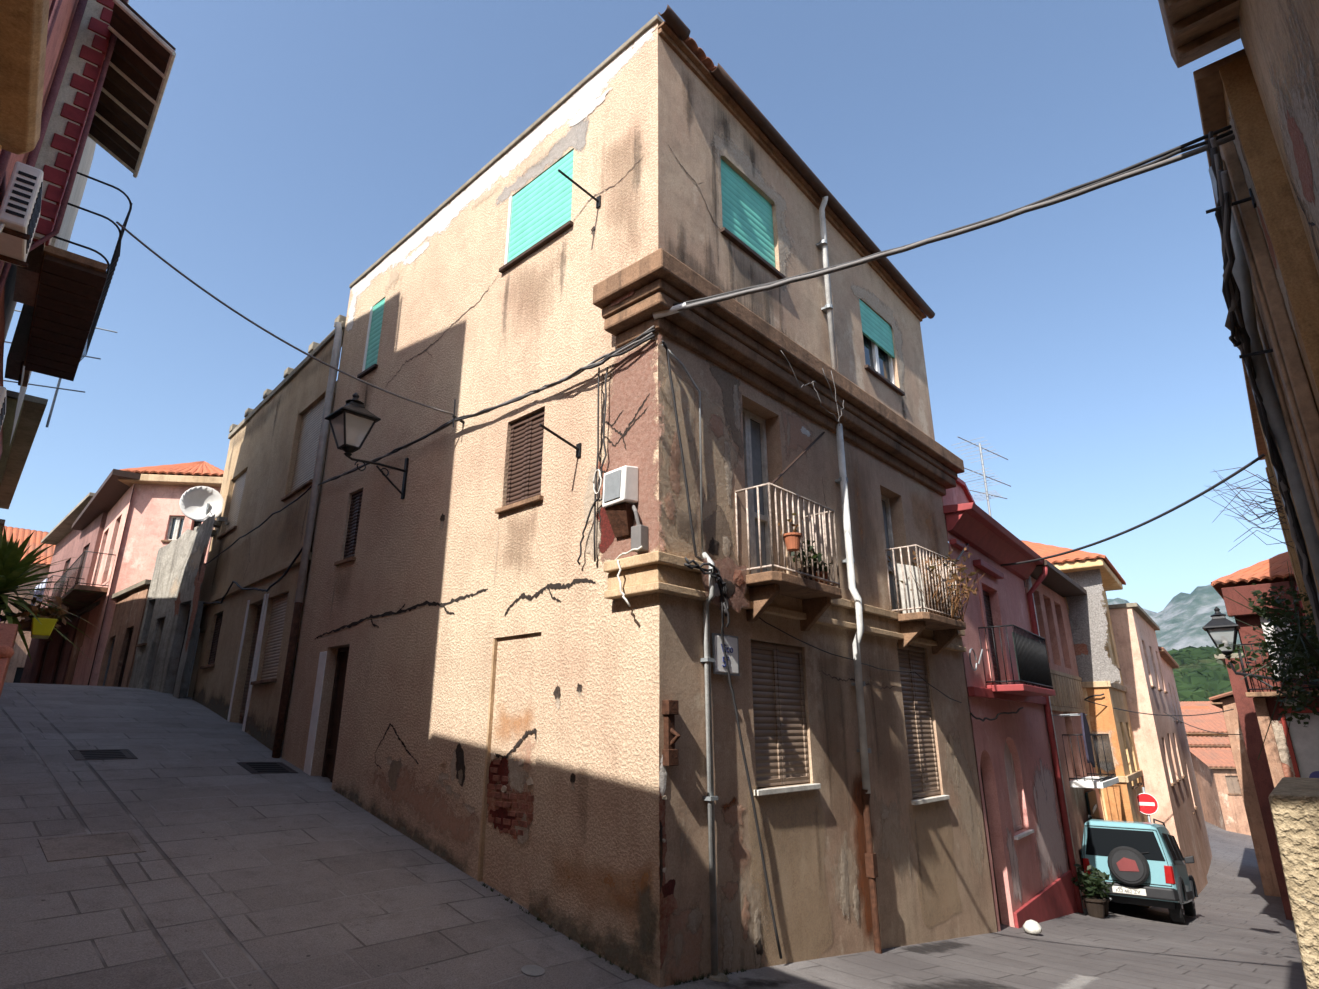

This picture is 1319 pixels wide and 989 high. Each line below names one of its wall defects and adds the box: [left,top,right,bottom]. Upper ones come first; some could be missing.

peeling [346,28,655,331]
crack [599,374,650,473]
crack [315,508,601,639]
crack [375,723,419,769]
spalling [487,728,537,844]
spalling [659,755,678,969]
peeling [719,798,767,973]
rust [853,777,873,935]